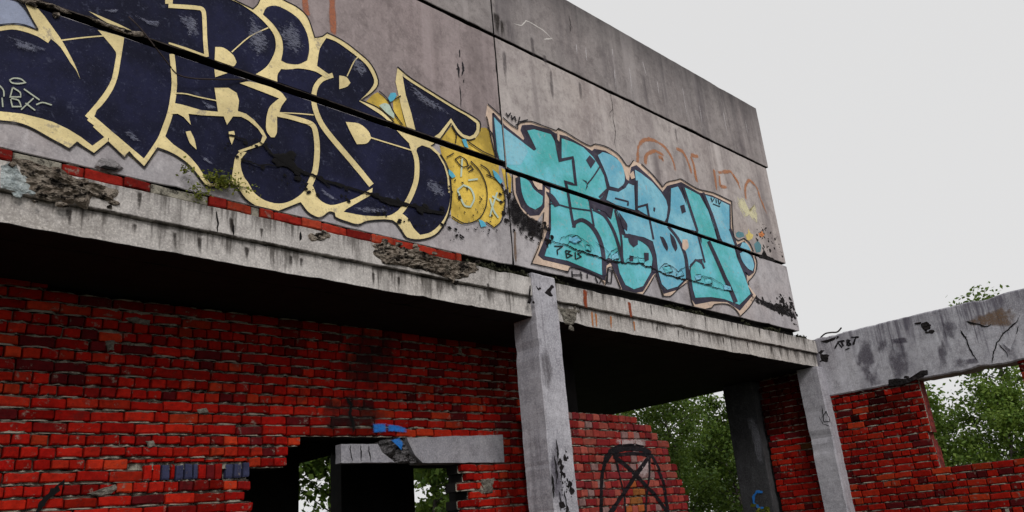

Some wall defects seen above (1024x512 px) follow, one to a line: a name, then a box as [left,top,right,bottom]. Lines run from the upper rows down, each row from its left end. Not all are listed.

spalling [0,158,120,209]
spalling [372,239,480,286]
leakage [859,344,875,384]
leakage [882,338,907,376]
crack [960,318,1019,361]